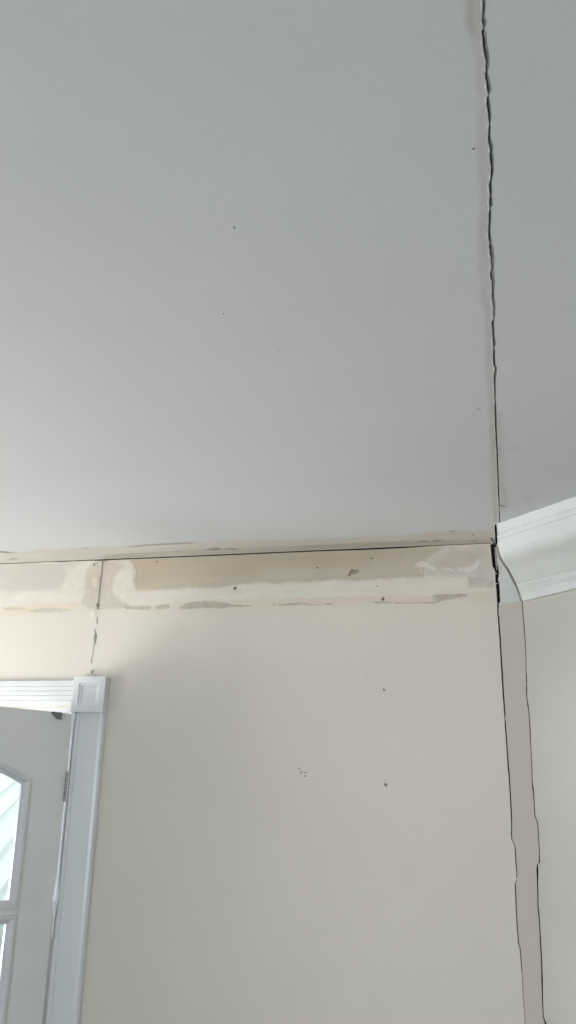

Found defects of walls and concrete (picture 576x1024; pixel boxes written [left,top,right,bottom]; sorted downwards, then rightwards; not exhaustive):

crack [52,544,465,676]
crack [476,0,526,1017]
crack [526,673,546,1024]